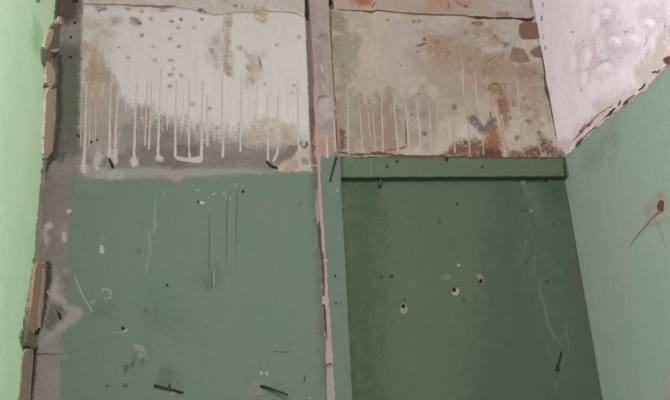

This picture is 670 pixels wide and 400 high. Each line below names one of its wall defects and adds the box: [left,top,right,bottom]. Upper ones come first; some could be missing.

damp [51,0,305,164]
damp [103,136,299,176]
damp [312,0,534,161]
rust [444,82,561,162]
spalling [486,22,542,64]
peeling [579,110,610,134]
flaking render [17,262,45,400]